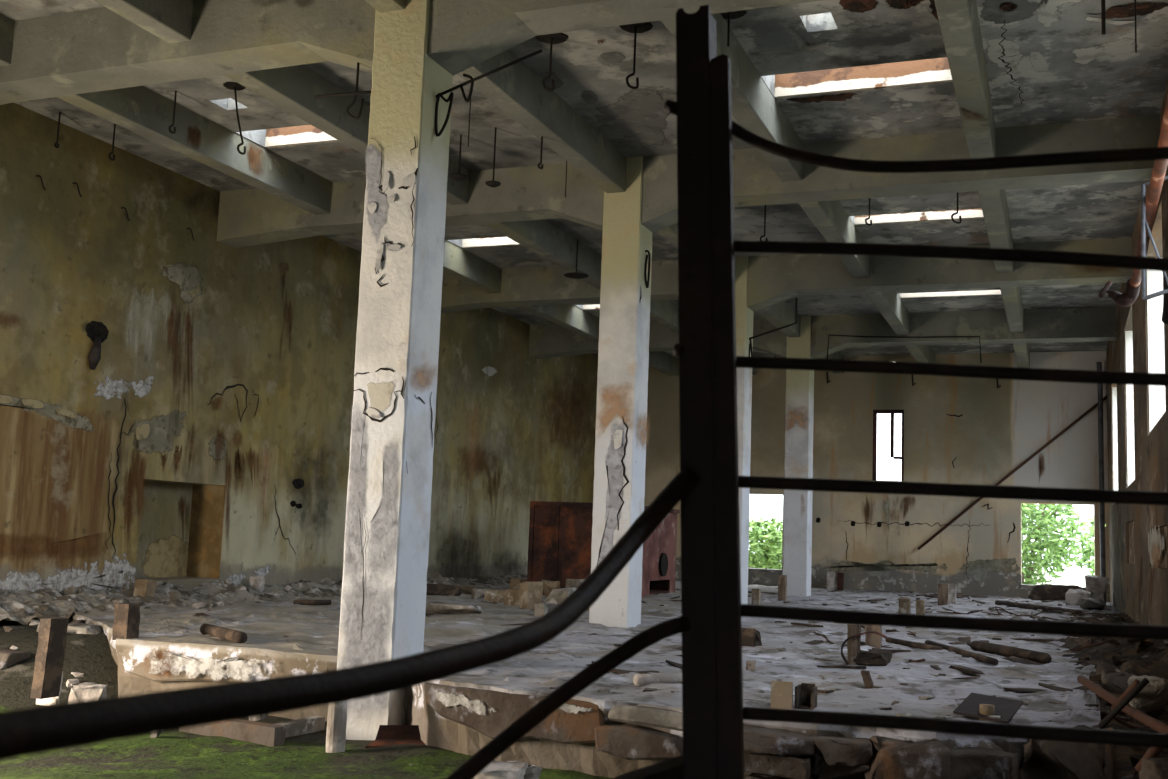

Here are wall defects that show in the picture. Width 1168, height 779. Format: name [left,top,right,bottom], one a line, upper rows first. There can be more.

spalling [839,0,939,21]
spalling [980,0,1083,27]
crack [998,20,1023,104]
peeling [366,138,418,287]
corrosion [169,302,192,389]
water stain [94,376,154,400]
corrosion [601,392,647,444]
crack [105,398,135,558]
corrosion [124,445,146,527]
peeling [342,382,401,668]
peeling [596,419,629,567]
peeling [348,693,388,709]